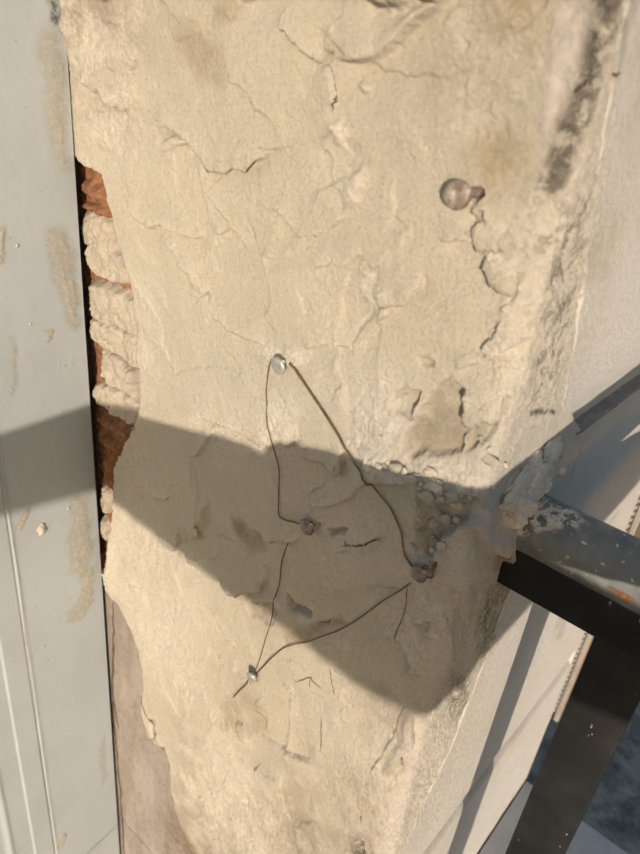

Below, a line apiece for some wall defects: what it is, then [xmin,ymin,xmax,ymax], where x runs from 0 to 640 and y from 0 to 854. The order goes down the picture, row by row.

leakage [546,0,621,192]
spalling [77,160,141,574]